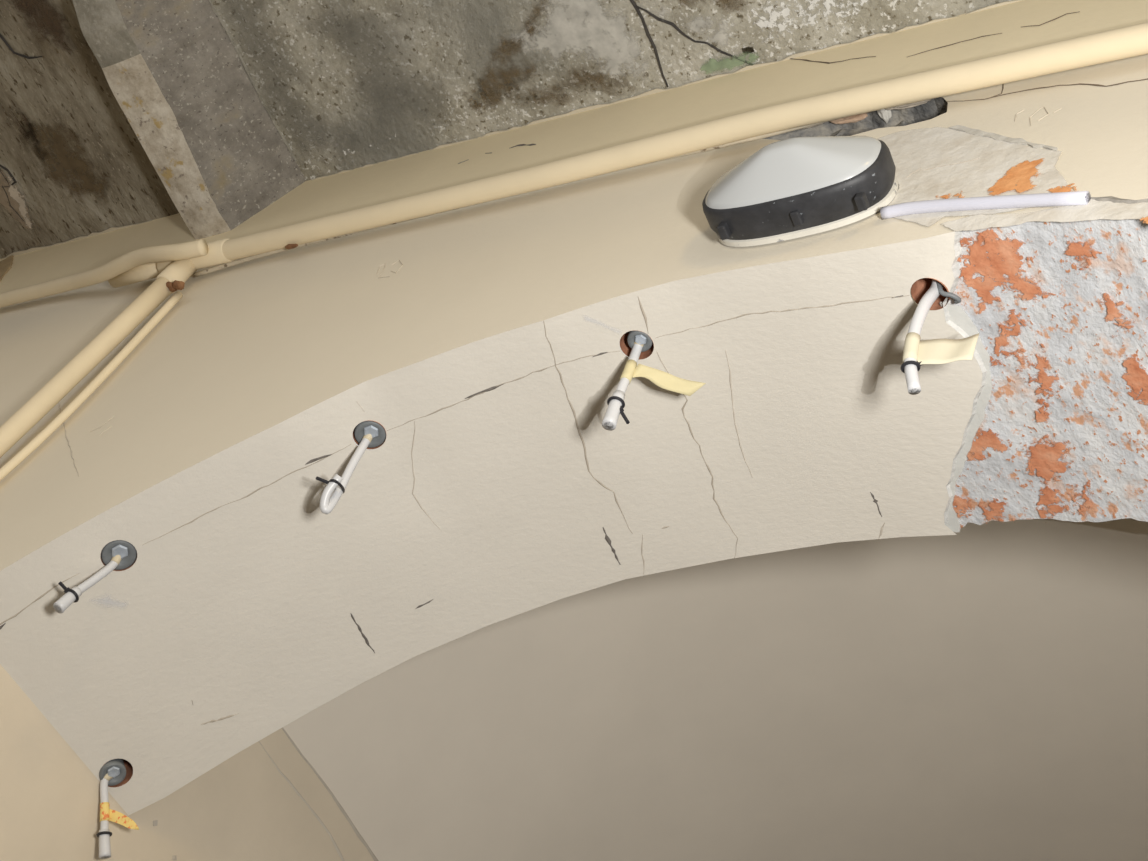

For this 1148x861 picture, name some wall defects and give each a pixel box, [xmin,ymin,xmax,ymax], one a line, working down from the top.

leakage [11,0,71,52]
crack [630,0,753,88]
crack [790,56,876,64]
crack [908,11,1080,57]
leakage [13,111,107,199]
leakage [7,174,32,229]
spalling [763,97,1148,532]
crack [387,321,645,566]
crack [638,295,909,555]
crack [143,444,351,545]
crack [0,573,79,629]